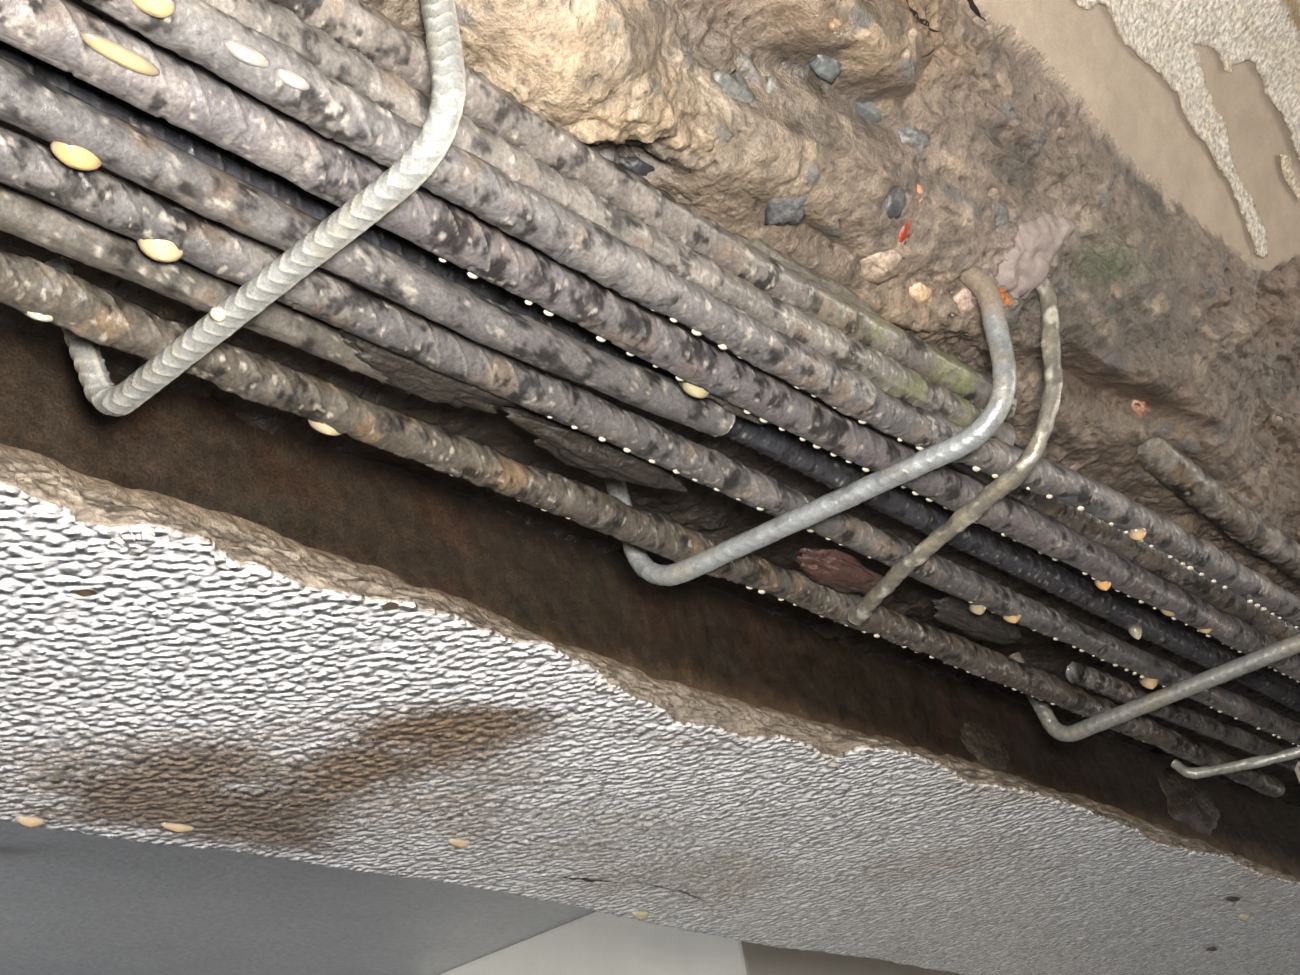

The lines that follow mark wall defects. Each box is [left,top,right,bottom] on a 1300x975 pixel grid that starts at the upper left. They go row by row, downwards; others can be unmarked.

spalling [0,0,431,378]
spalling [163,0,1300,724]
leakage [10,705,783,898]
peeling [0,443,1300,975]